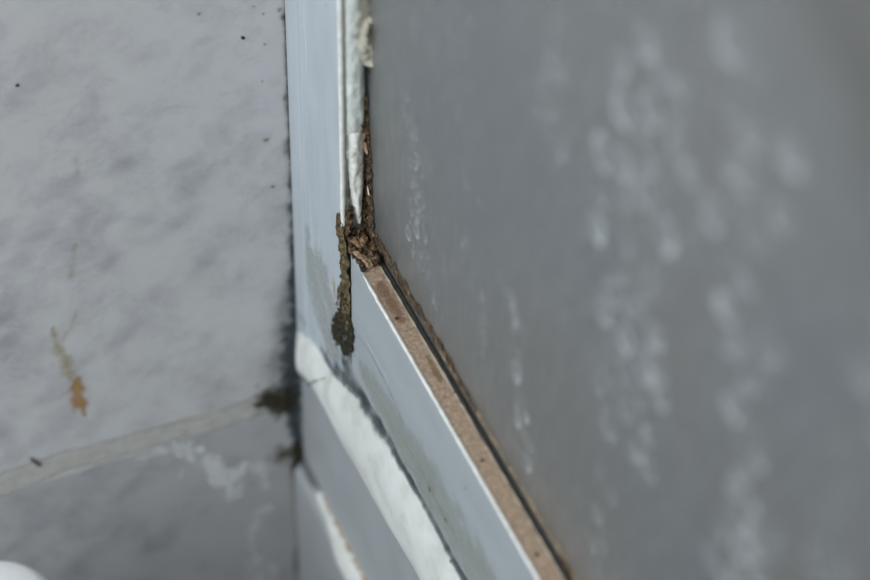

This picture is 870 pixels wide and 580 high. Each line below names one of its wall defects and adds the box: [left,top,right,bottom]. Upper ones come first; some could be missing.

corrosion [72,378,86,416]
water stain [136,439,270,500]
water stain [253,204,321,492]
water stain [321,66,578,580]